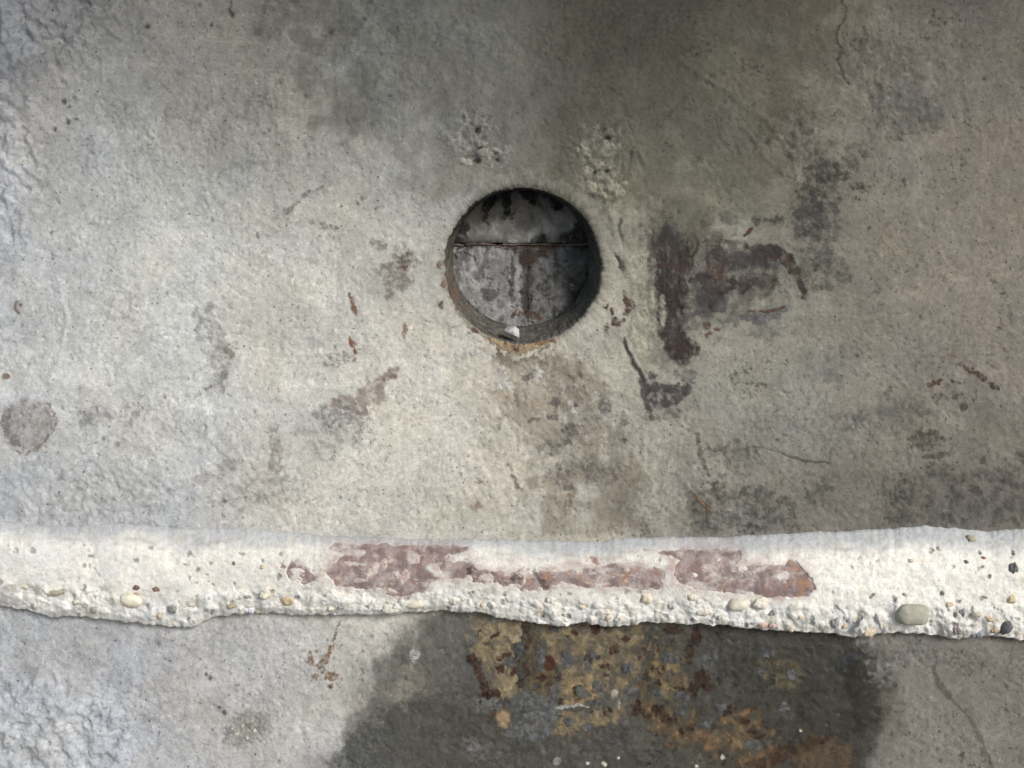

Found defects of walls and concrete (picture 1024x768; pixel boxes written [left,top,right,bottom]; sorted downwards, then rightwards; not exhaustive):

rust [467,246,565,320]
leakage [344,612,882,768]
rust [465,612,856,768]